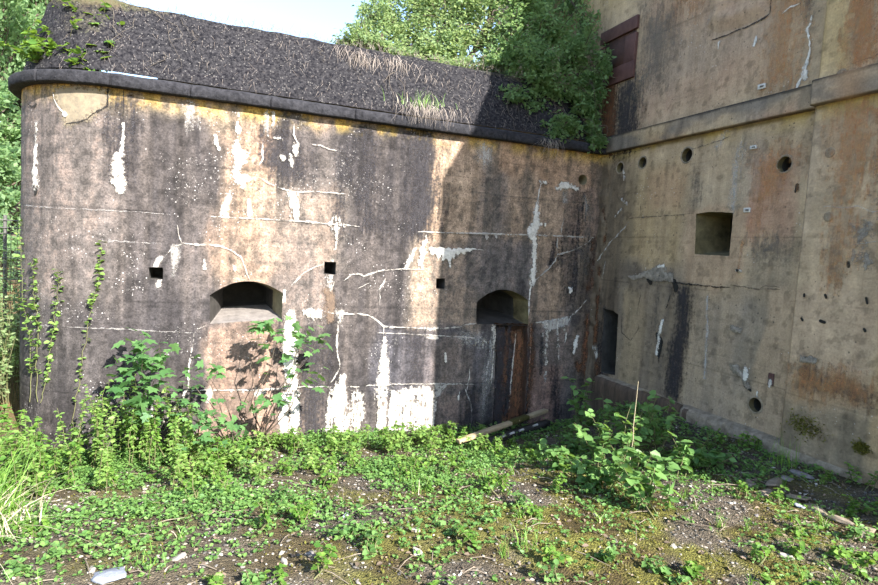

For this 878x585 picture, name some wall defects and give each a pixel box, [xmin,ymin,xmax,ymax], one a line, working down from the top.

crack [710,1,771,41]
water stain [796,15,812,88]
water stain [102,92,142,194]
water stain [328,123,386,262]
water stain [276,275,437,436]
water stain [455,325,496,429]
rust [484,324,536,425]
water stain [654,286,692,402]